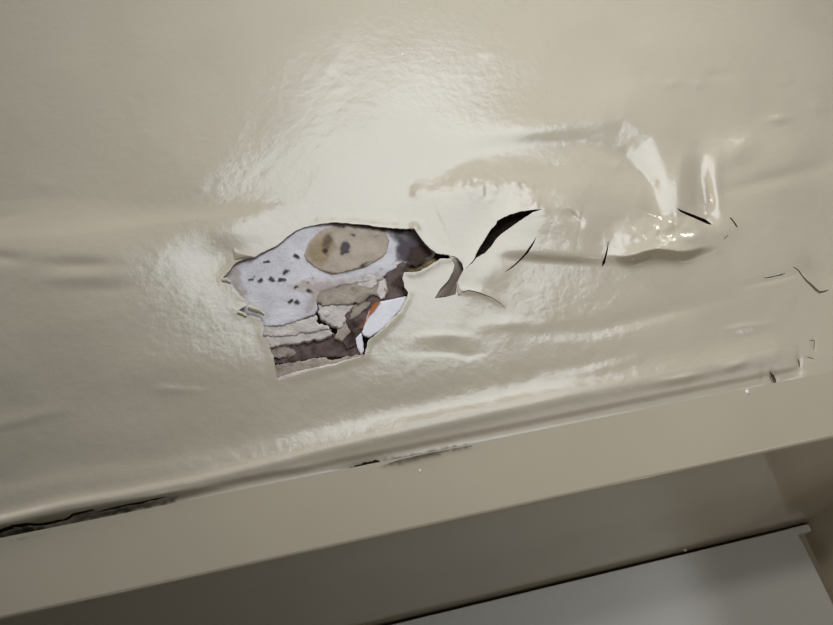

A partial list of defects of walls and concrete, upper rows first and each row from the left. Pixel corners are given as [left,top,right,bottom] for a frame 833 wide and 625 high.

peeling [222,222,457,380]
crack [435,209,541,308]
peeling [444,209,606,295]
crack [677,208,737,239]
crack [764,267,828,294]
crack [0,497,165,533]